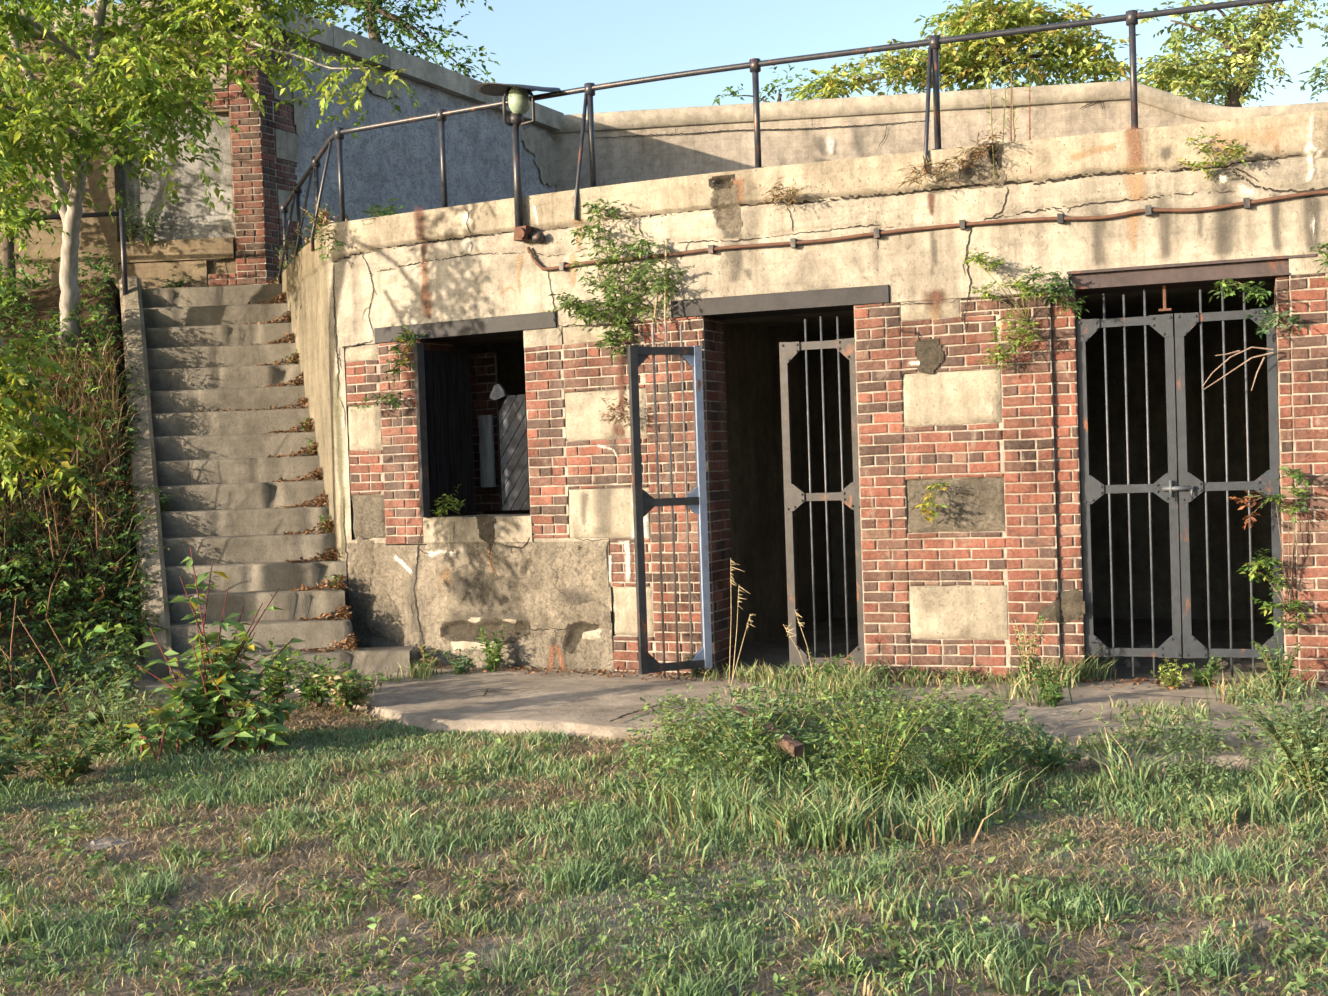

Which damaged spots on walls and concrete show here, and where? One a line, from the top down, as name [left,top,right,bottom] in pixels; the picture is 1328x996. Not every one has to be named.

rust [415,209,431,318]
crack [614,154,1328,342]
crack [411,517,455,655]
spalling [440,617,530,650]
crack [459,537,569,638]
spalling [562,620,602,653]
crack [577,538,610,585]